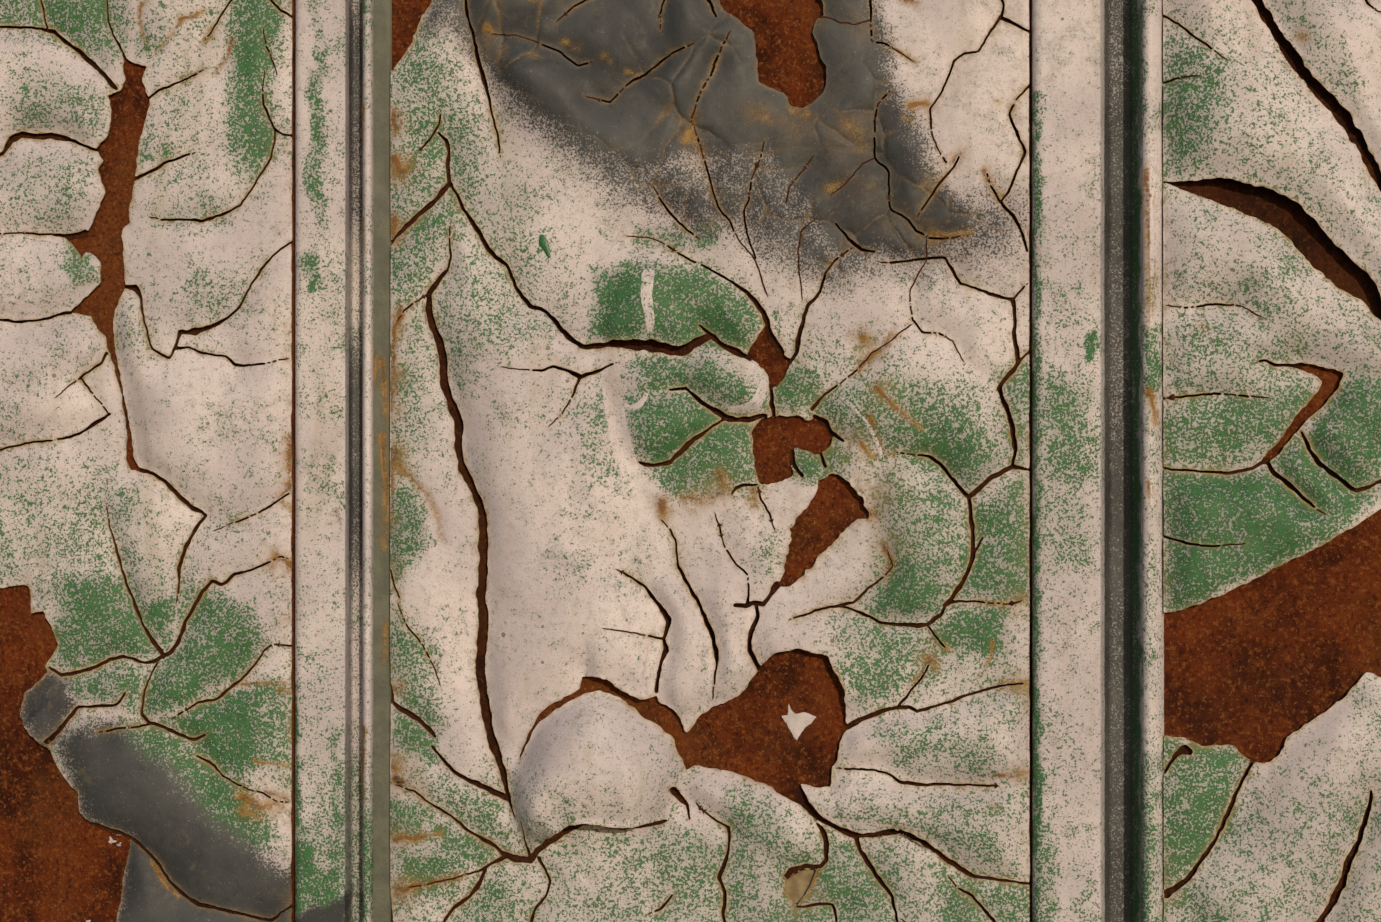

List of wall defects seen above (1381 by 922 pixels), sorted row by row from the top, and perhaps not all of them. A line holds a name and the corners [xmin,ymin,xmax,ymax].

crack [0,0,233,100]
peeling [711,0,846,127]
crack [1251,0,1381,192]
peeling [0,553,148,922]
peeling [46,27,167,482]
crack [49,468,293,922]
crack [127,243,292,367]
corrosion [658,496,701,519]
crack [391,0,1030,922]
peeling [732,305,882,607]
peeling [1163,453,1381,783]
crack [1316,790,1373,922]